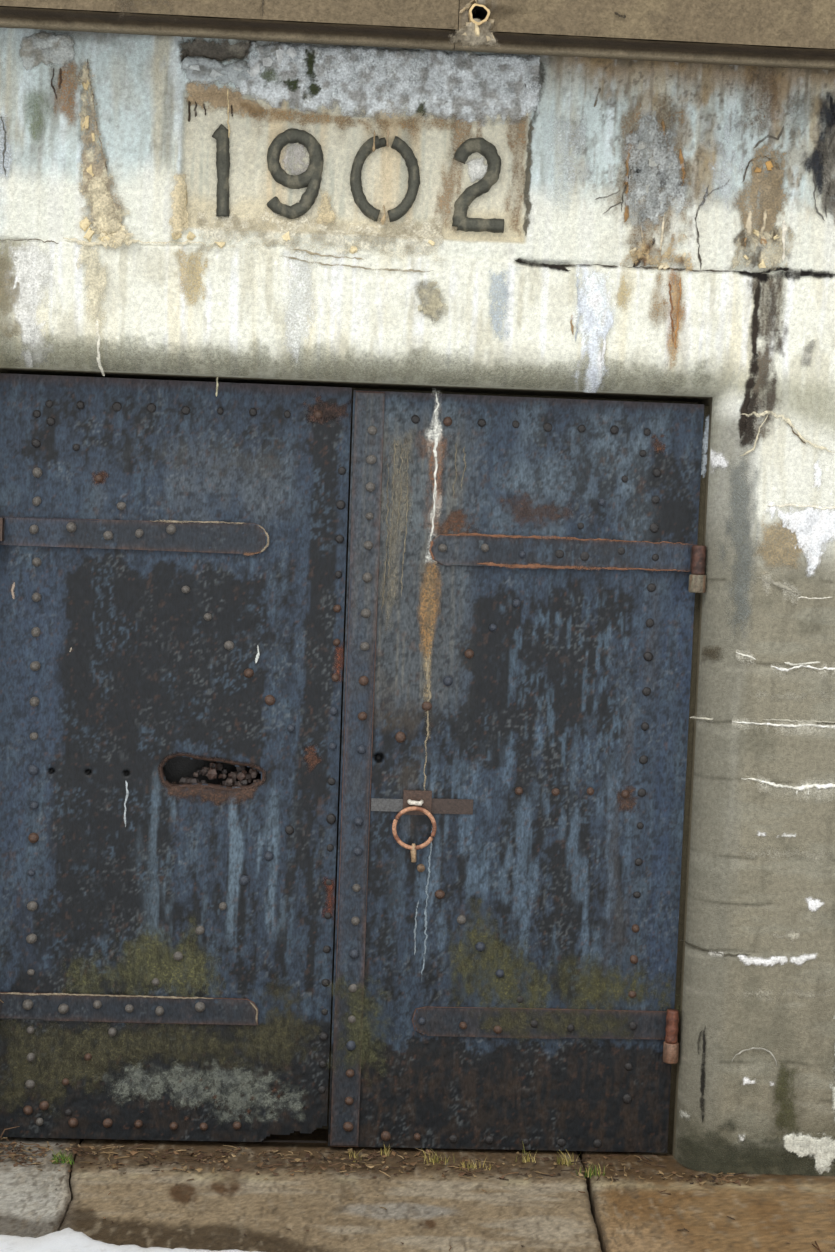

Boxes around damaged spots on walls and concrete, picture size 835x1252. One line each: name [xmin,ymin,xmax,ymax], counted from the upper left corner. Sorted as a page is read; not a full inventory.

flaking render [180,38,540,126]
water stain [804,93,835,221]
water stain [738,276,787,446]
rust [429,493,693,560]
water stain [701,416,835,625]
rust [477,562,687,572]
crack [736,651,835,672]
crack [690,717,835,730]
rust [167,762,260,805]
crack [741,778,835,795]